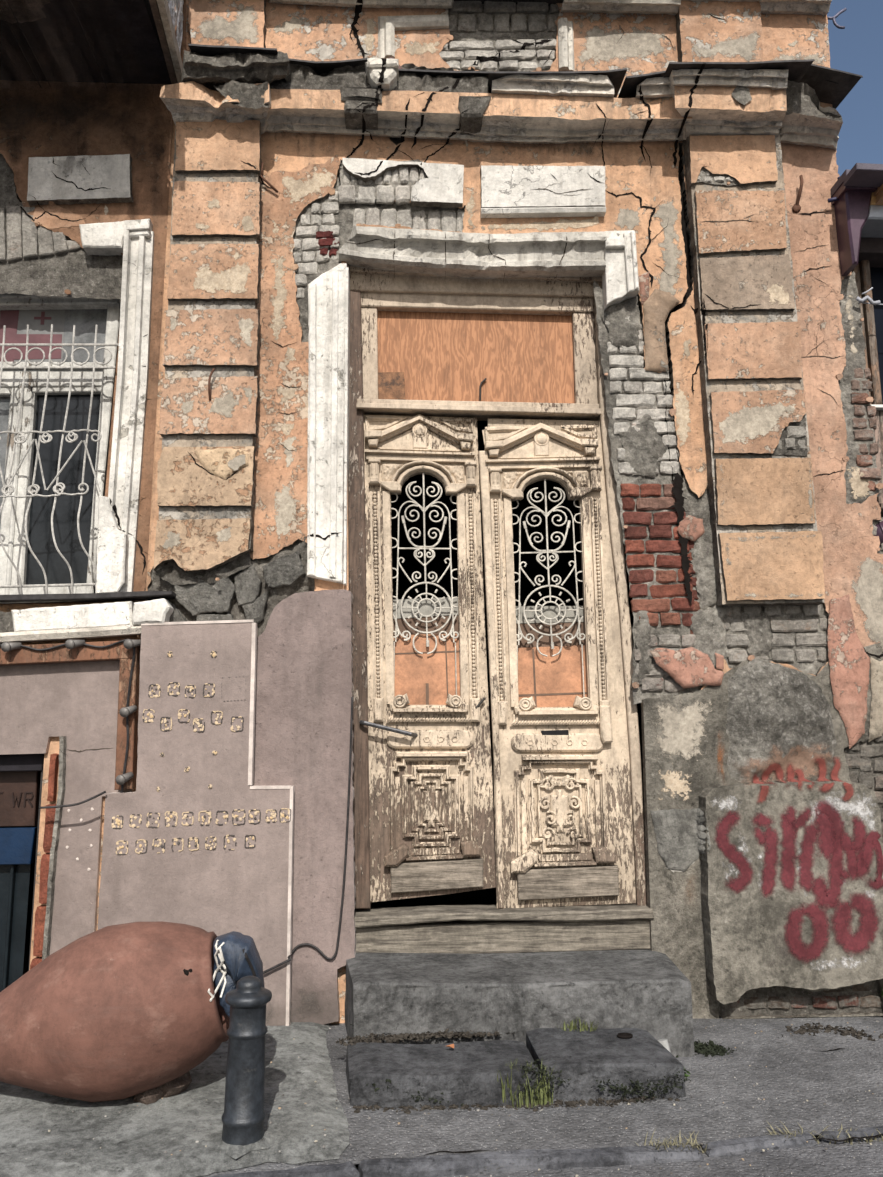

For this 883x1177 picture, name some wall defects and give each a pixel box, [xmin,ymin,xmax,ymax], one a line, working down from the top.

crack [338,0,557,175]
flaking render [404,1,559,71]
flaking render [0,155,123,299]
crack [17,158,111,222]
flaking render [270,159,599,366]
peeling [615,207,640,230]
crack [530,64,760,605]
crack [796,245,829,284]
peeling [281,423,296,467]
flaking render [148,484,318,636]
flaking render [593,271,883,840]
flaking render [719,980,883,1018]